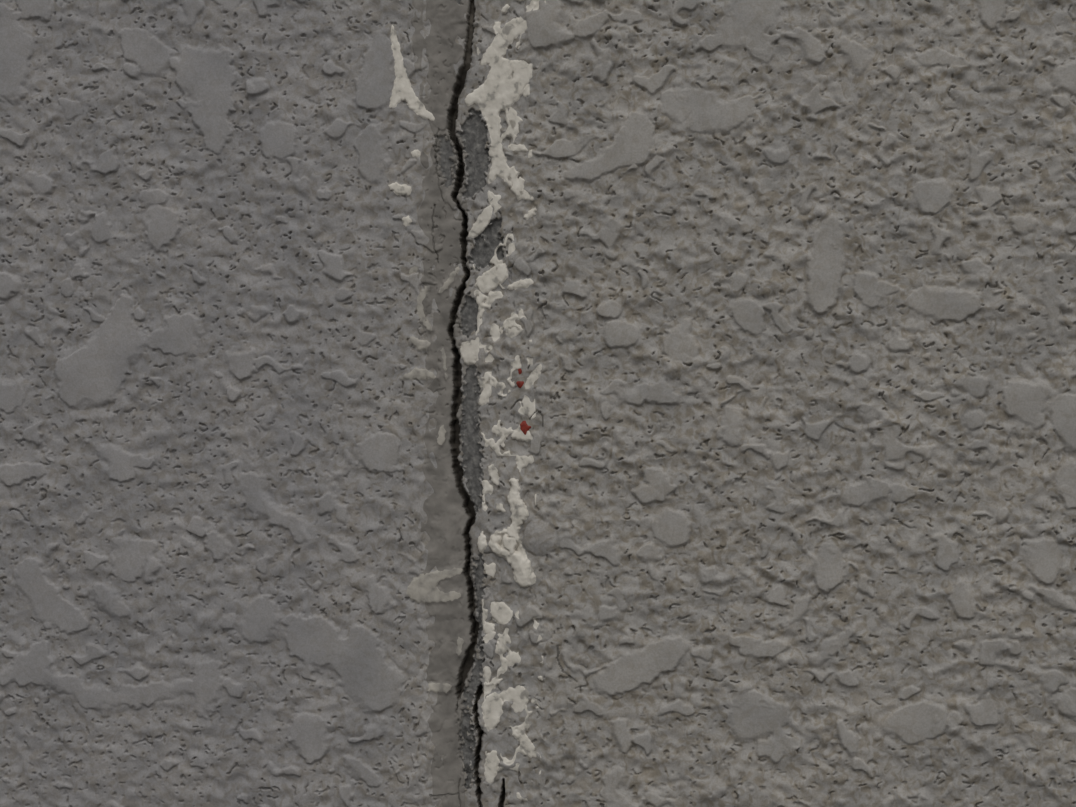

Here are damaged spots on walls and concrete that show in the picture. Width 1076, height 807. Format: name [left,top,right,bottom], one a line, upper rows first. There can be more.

peeling [388,182,412,196]
peeling [389,25,435,121]
crack [429,0,505,807]
peeling [399,0,546,789]